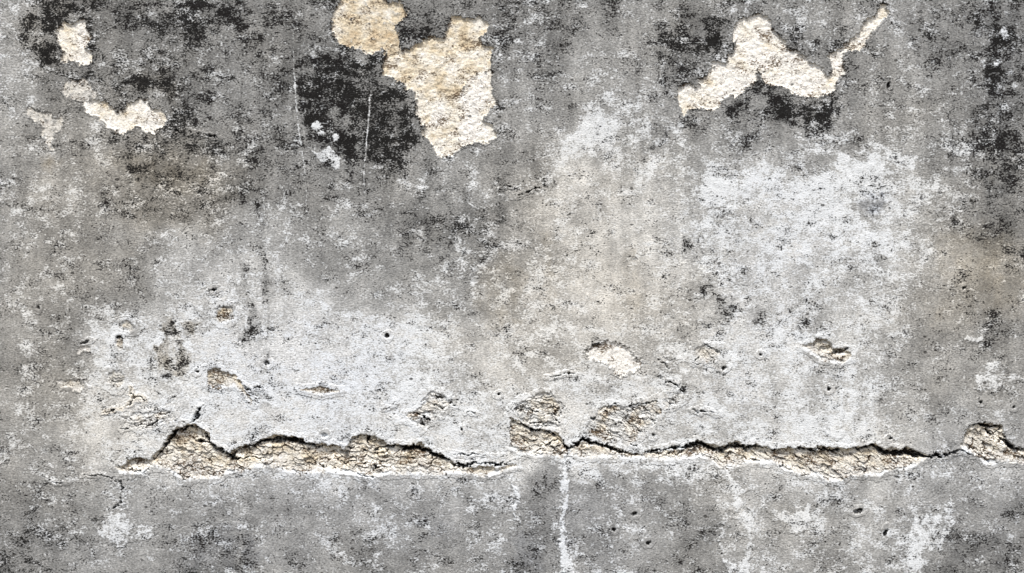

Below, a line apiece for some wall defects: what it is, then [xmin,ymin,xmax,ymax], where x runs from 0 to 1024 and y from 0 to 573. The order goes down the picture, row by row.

peeling [20,15,169,153]
water stain [6,0,256,210]
water stain [289,34,532,291]
peeling [328,0,501,160]
water stain [399,8,444,50]
water stain [635,0,856,162]
peeling [672,0,892,119]
water stain [953,0,1024,222]
spalling [109,387,933,501]
crack [44,339,1024,513]
spalling [795,333,857,370]
spalling [954,357,1024,470]